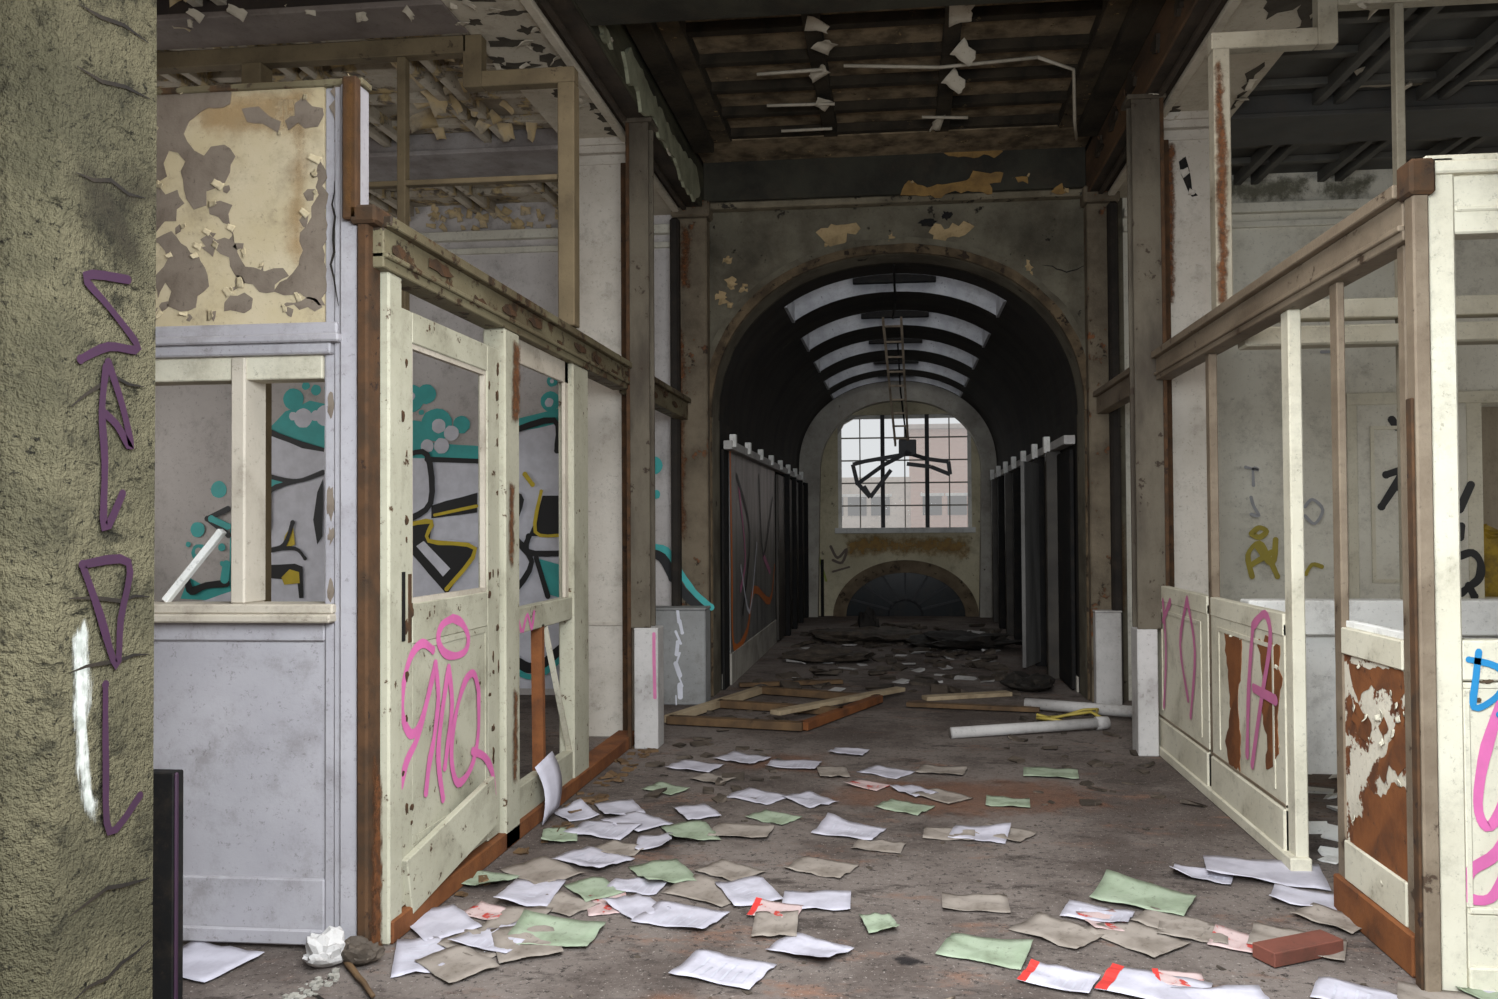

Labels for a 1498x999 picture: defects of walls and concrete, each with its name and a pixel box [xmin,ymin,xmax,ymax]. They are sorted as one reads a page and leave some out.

peeling [169,0,205,32]
peeling [226,4,248,22]
peeling [450,0,566,70]
peeling [1264,0,1312,28]
peeling [390,59,537,143]
peeling [598,25,700,202]
peeling [156,65,349,322]
spalling [816,223,861,247]
peeling [900,150,1030,198]
corrosion [1214,61,1229,303]
peeling [1224,633,1283,771]
peeling [1349,662,1408,886]